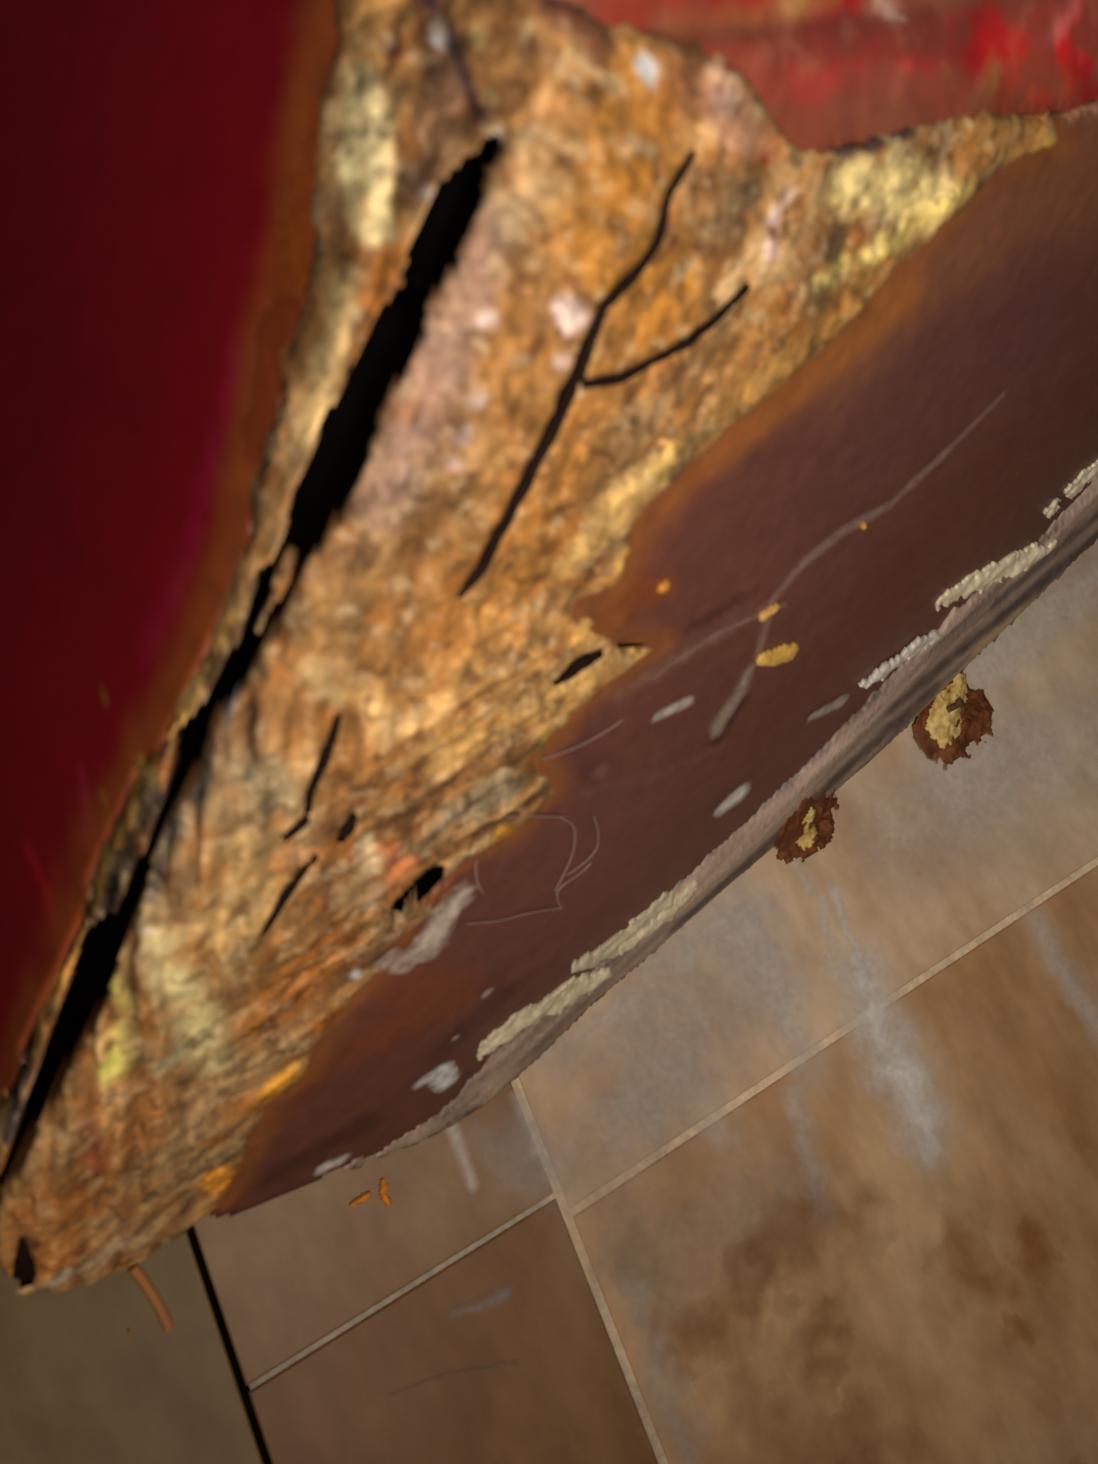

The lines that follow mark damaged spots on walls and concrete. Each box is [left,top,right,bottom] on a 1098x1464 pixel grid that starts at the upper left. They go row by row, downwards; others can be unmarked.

crack [457,150,751,598]
peeling [1043,459,1098,519]
peeling [935,540,1058,612]
crack [0,141,498,1186]
peeling [654,697,692,721]
peeling [809,629,941,720]
rust [912,671,994,771]
peeling [716,785,748,813]
rust [774,788,839,865]
peeling [476,879,699,1061]
peeling [416,1064,457,1090]
crack [13,1238,37,1289]